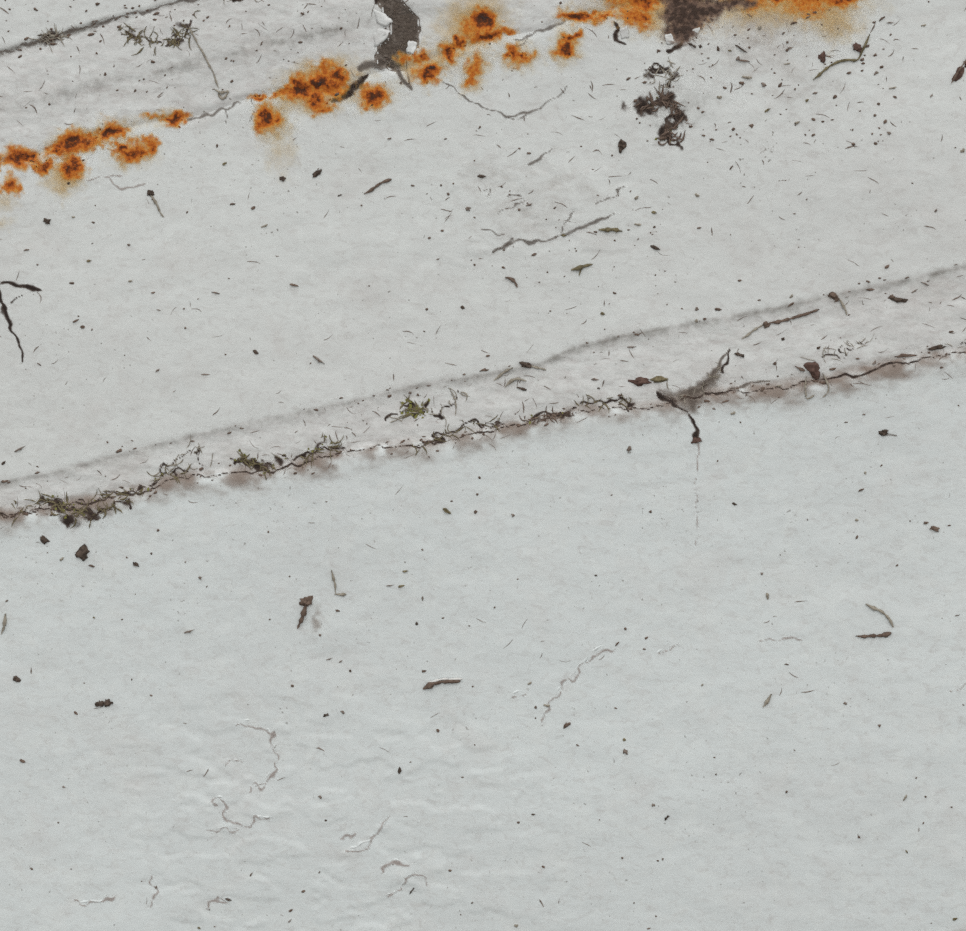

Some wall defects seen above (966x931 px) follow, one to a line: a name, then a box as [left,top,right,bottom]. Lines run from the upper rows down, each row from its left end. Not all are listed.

spalling [331,0,421,102]
rust [394,0,537,87]
rust [551,0,667,59]
rust [725,0,858,32]
rust [143,110,190,128]
rust [248,58,390,134]
rust [0,121,161,194]
crack [0,281,42,362]
crack [0,352,964,517]